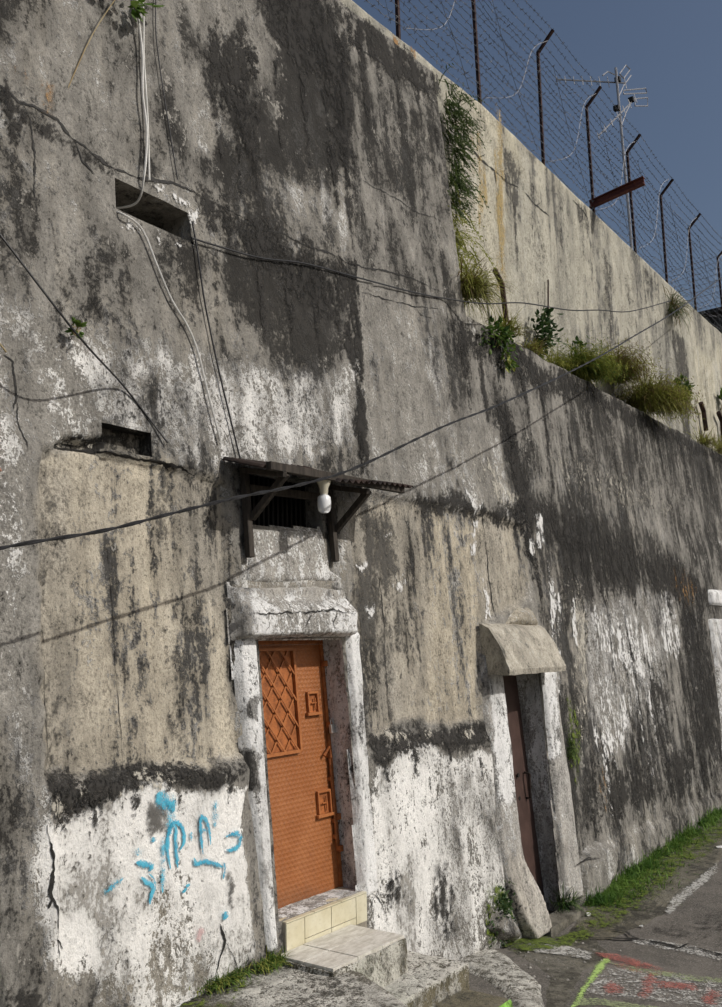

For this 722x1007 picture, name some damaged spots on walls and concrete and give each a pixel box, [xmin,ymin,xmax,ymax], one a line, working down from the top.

crack [0,85,441,319]
leakage [195,14,370,475]
leakage [257,0,441,232]
leakage [603,250,614,343]
crack [47,825,63,953]
leakage [47,758,247,834]
leakage [166,645,186,748]
crack [240,608,355,632]
leakage [353,499,492,792]
leakage [405,316,722,844]